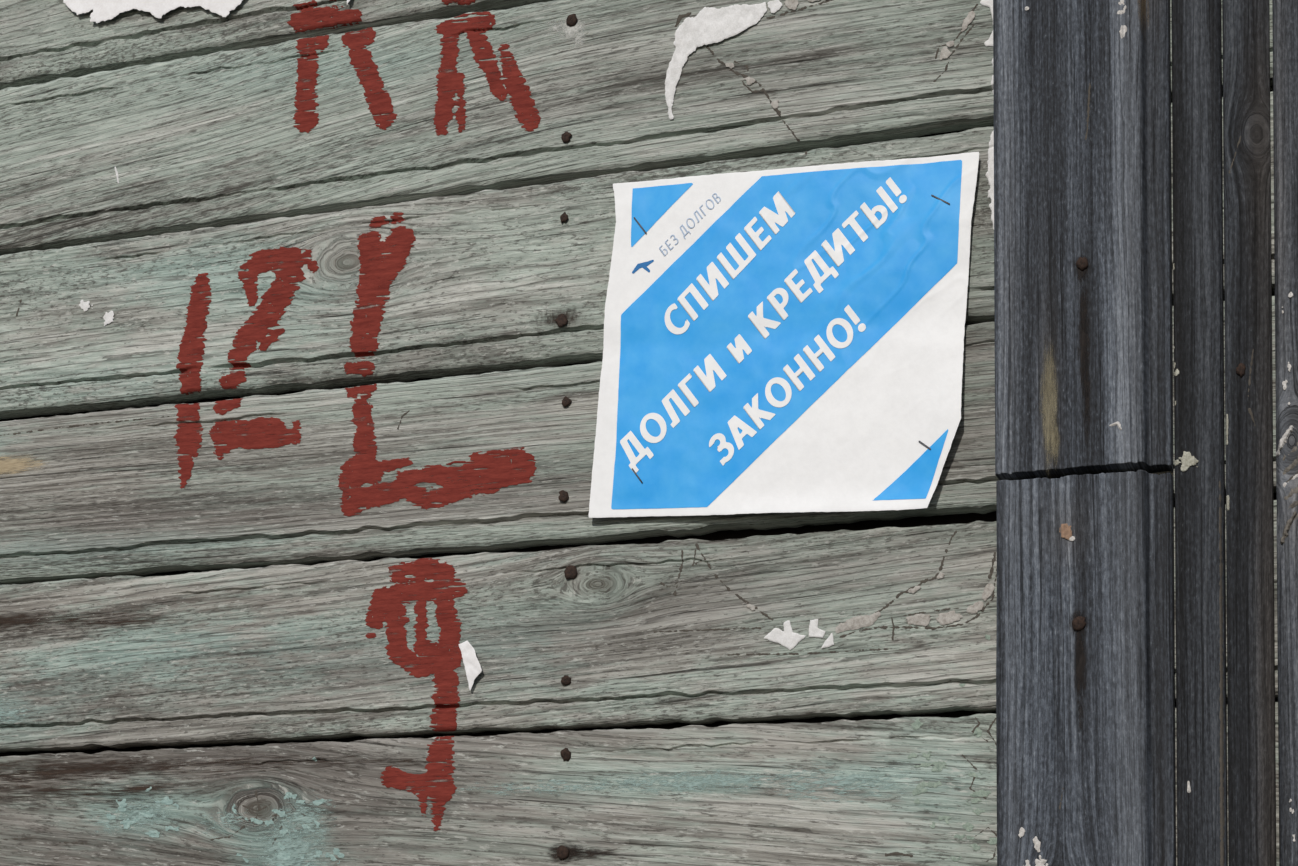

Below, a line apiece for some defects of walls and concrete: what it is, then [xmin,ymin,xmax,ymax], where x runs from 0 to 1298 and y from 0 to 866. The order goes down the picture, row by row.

crack [706,46,807,154]
crack [654,543,895,656]
crack [875,531,957,613]
corrosion [550,843,613,864]